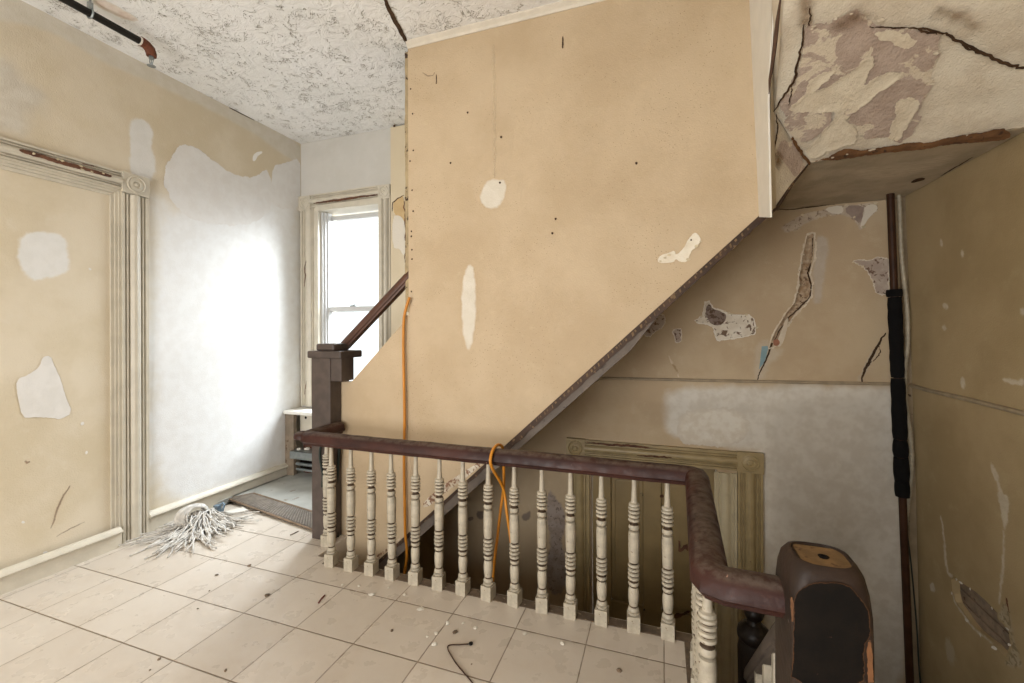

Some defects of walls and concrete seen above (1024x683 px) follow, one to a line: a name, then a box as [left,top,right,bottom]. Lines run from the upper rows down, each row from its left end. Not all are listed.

crack [870,26,1024,69]
flaking render [776,8,941,176]
peeling [780,202,879,233]
peeling [851,257,890,296]
spalling [504,217,766,449]
crack [861,333,886,382]
spalling [951,578,1011,651]